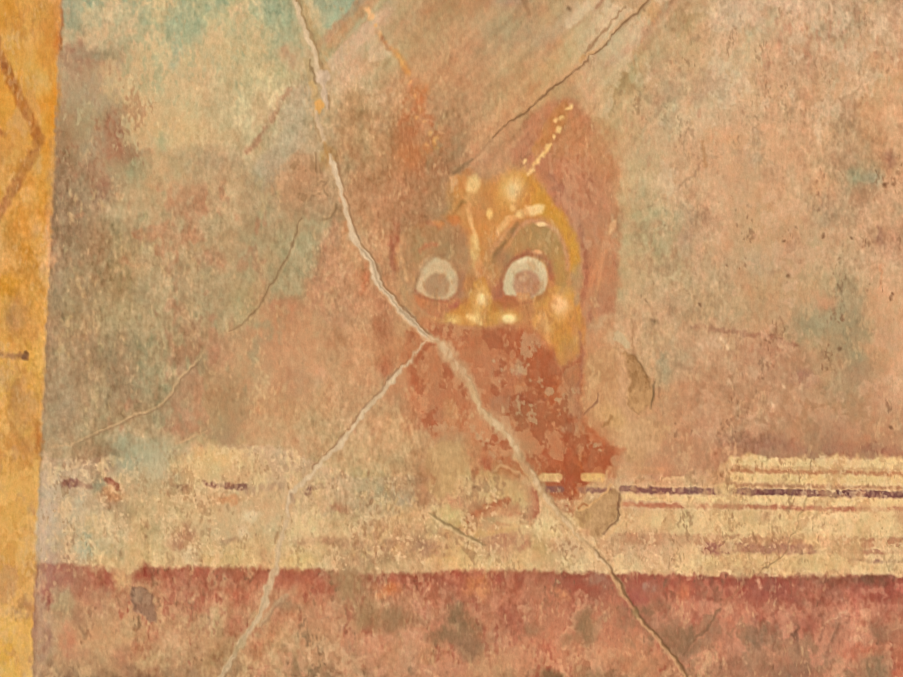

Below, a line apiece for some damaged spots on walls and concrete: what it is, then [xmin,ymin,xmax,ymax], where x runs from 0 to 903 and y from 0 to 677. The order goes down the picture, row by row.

crack [214,0,689,677]
spalling [579,317,673,472]
spalling [571,469,627,541]